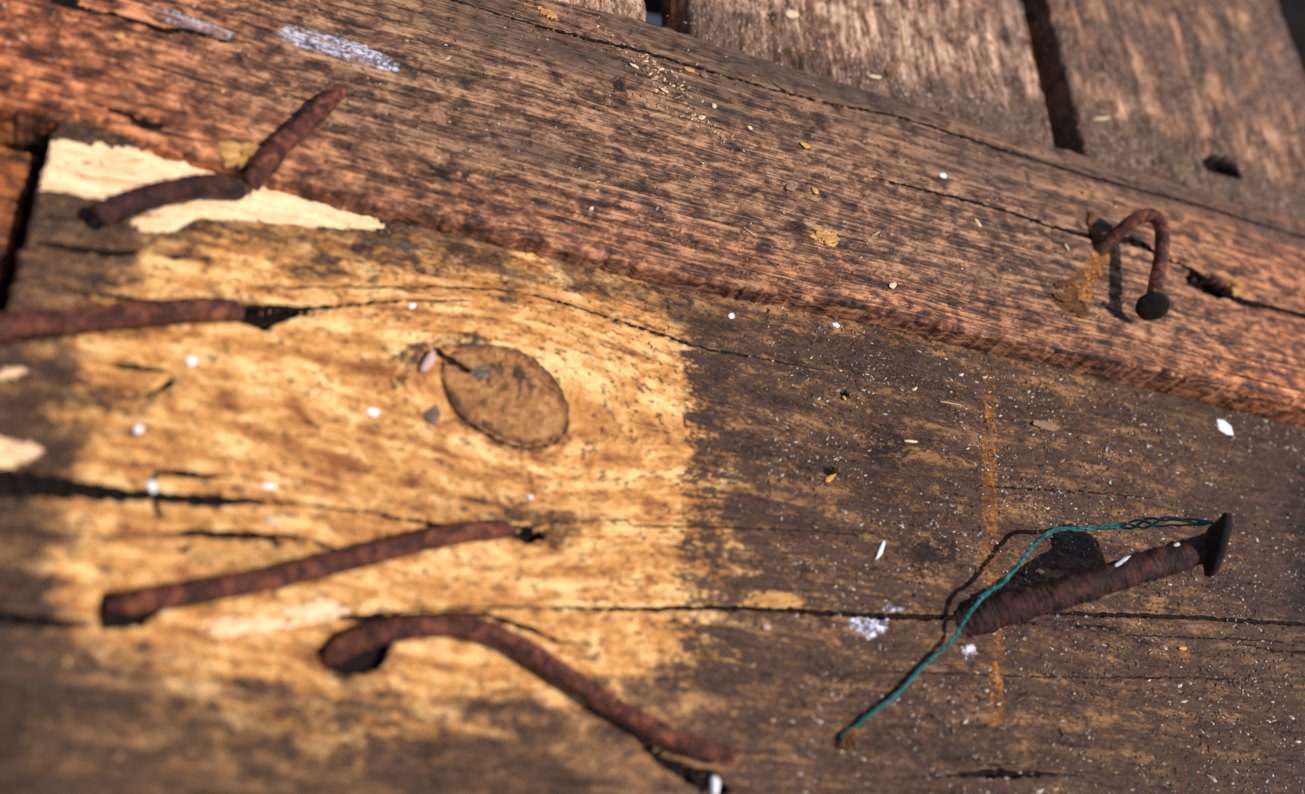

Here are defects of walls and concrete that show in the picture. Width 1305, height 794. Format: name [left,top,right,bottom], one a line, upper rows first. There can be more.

rust [1066,249,1114,315]
crack [0,467,446,561]
crack [515,519,856,535]
crack [337,604,954,659]
crack [1017,611,1305,654]
crack [849,671,1233,681]